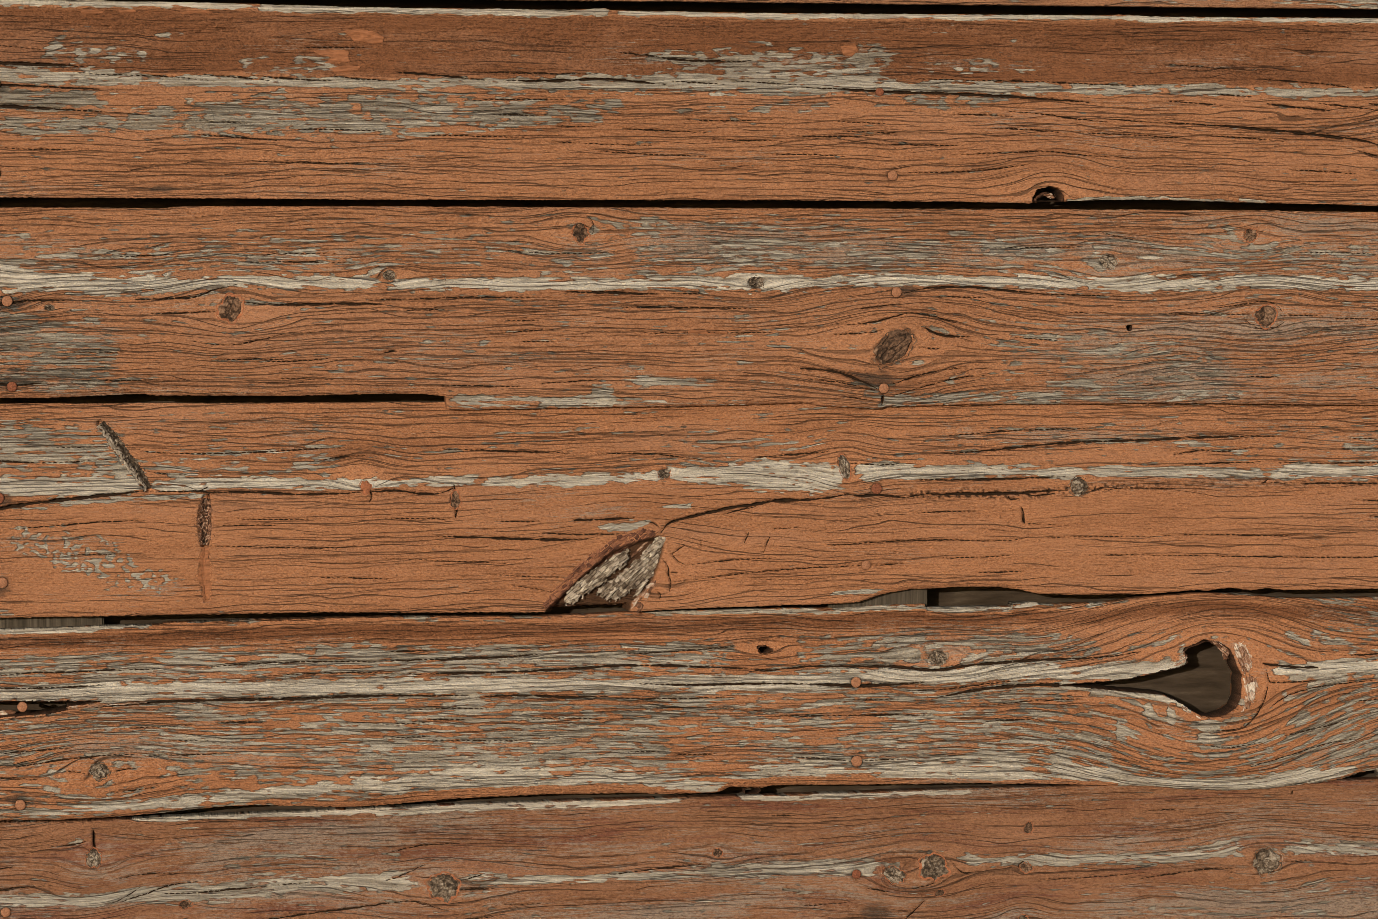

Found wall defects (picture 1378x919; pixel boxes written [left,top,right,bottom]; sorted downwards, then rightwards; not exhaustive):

peeling [0,0,1378,141]
crack [0,45,1378,174]
crack [79,352,158,382]
crack [444,379,604,387]
peeling [0,214,1378,410]
peeling [0,417,1378,599]
crack [0,426,1378,597]
peeling [0,588,1378,919]